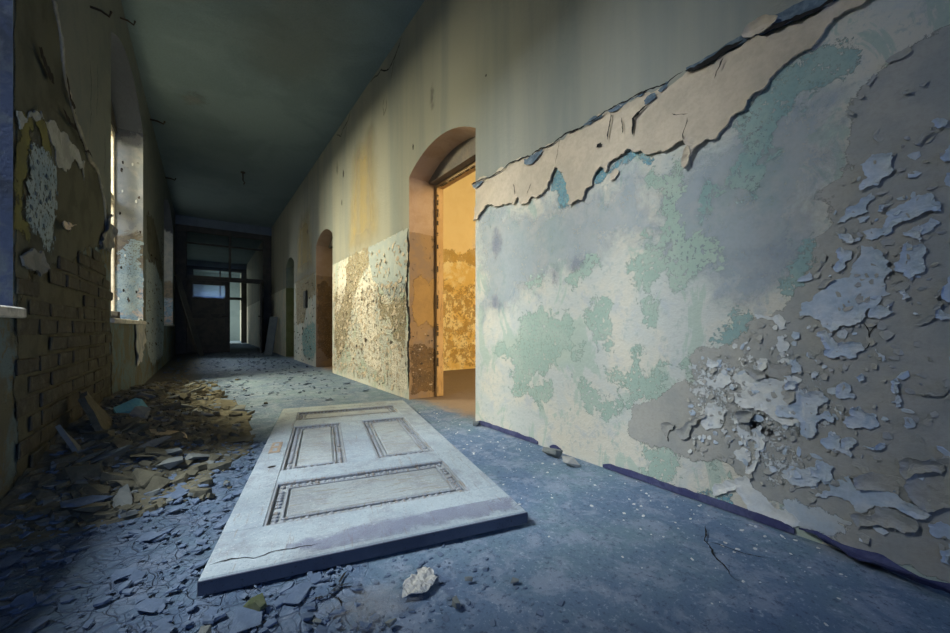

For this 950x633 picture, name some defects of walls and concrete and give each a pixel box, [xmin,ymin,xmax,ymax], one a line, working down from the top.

spalling [13,0,164,487]
peeling [294,228,435,395]
peeling [443,248,476,267]
peeling [571,24,950,583]
crack [704,528,767,577]